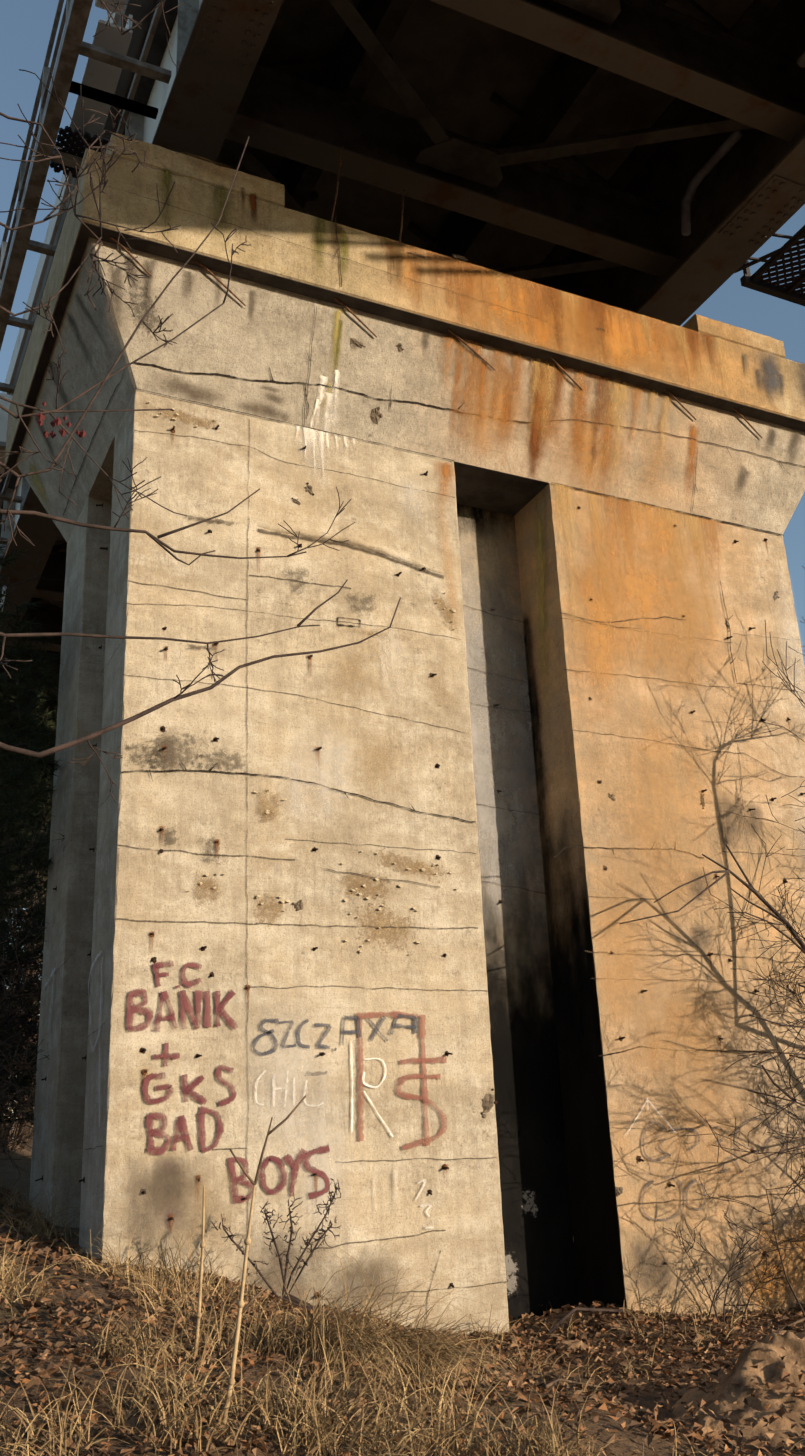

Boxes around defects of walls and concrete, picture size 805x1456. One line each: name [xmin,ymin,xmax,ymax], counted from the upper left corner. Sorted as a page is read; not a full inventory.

damp [315,217,348,267]
damp [169,381,212,399]
damp [245,310,356,465]
crack [63,214,805,516]
rust [381,238,722,580]